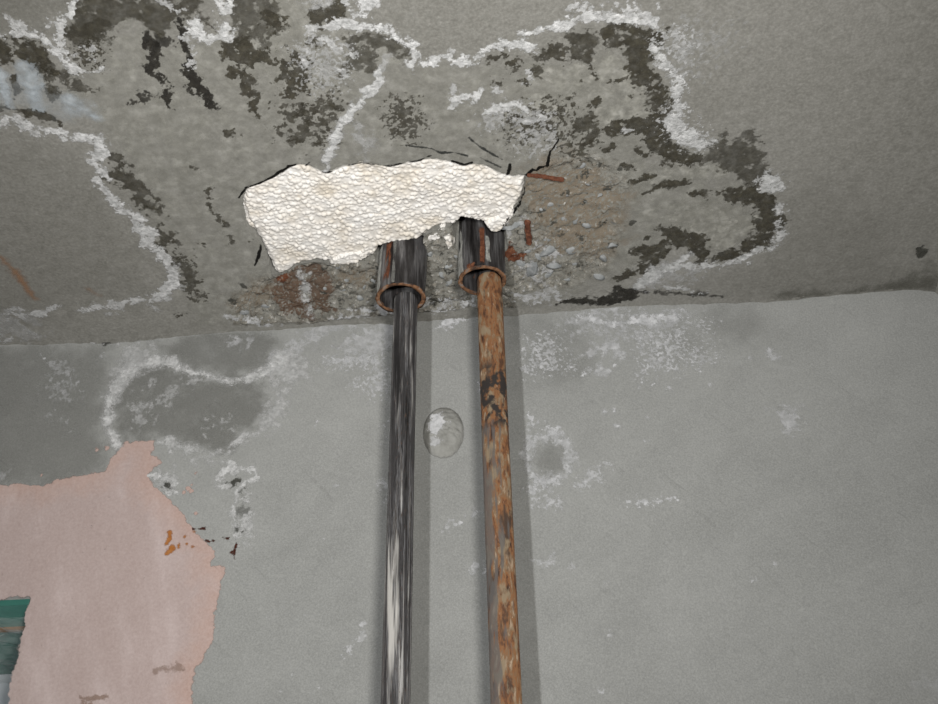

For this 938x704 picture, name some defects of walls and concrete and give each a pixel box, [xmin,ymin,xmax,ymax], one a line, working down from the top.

crack [254,245,262,266]
spalling [226,254,394,326]
water stain [0,0,790,404]
crack [238,137,559,226]
spalling [417,227,478,313]
rust [505,241,527,262]
spalling [502,151,637,308]
water stain [91,339,308,464]
peeling [147,472,197,496]
water stain [519,411,612,513]